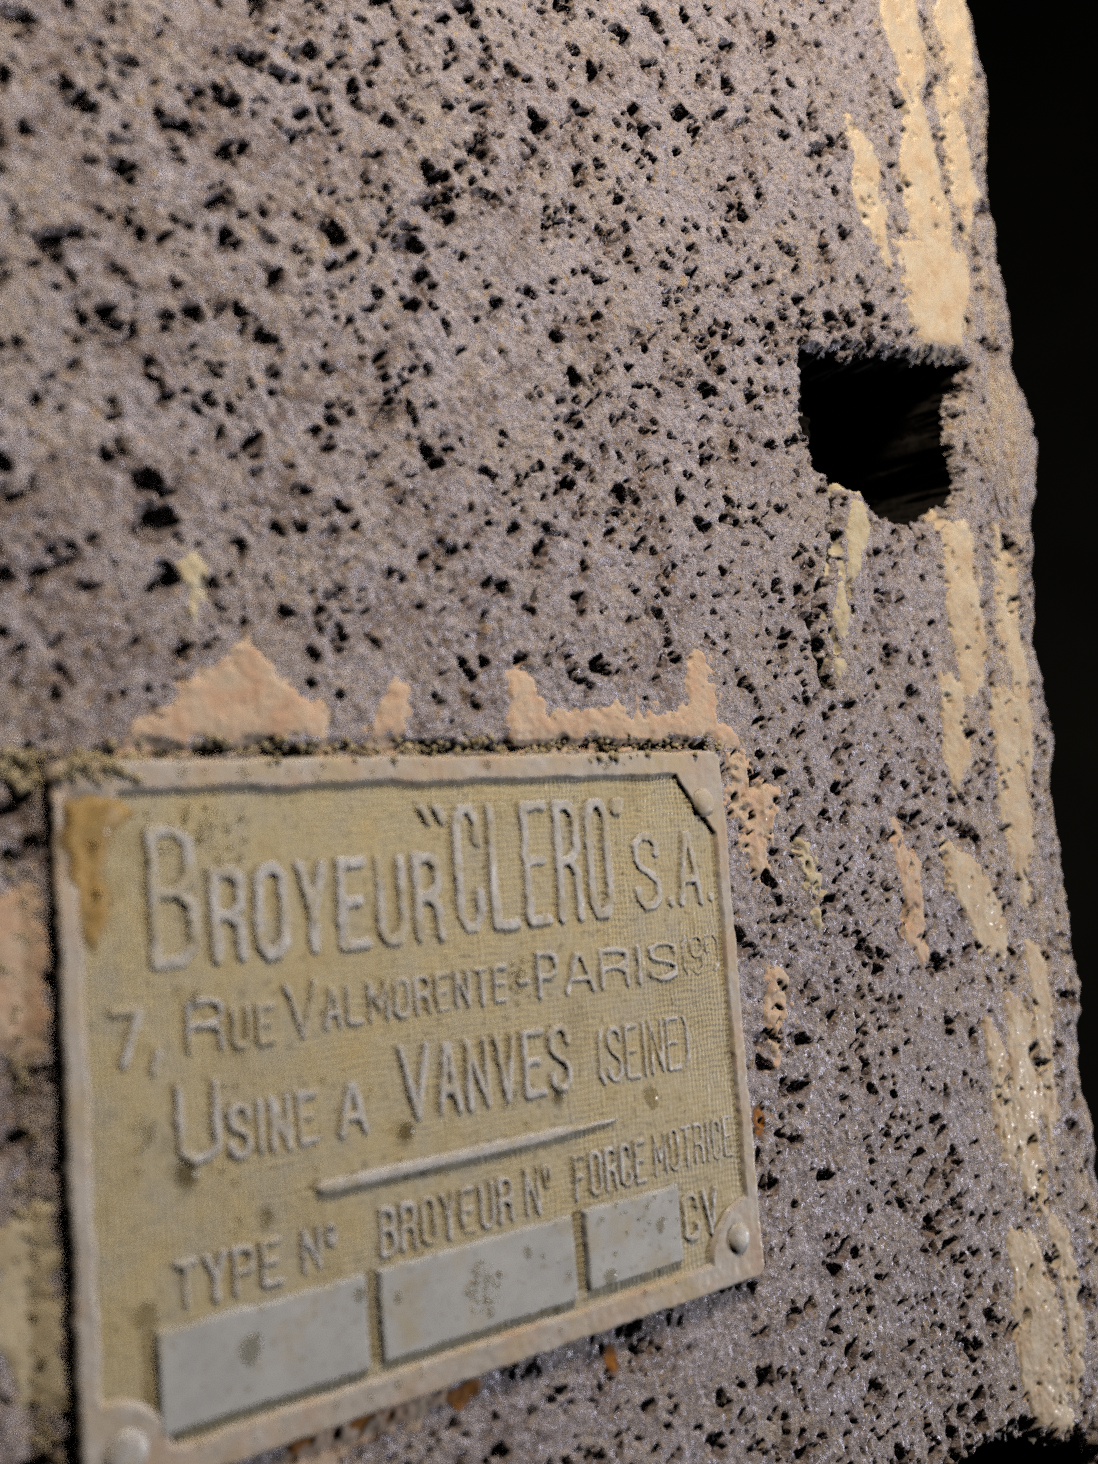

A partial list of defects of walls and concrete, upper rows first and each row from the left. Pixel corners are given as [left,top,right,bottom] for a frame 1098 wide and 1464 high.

peeling [839,0,981,366]
peeling [103,628,336,760]
peeling [354,676,414,755]
peeling [923,509,1036,911]
peeling [887,816,1086,1445]
peeling [272,1387,448,1464]